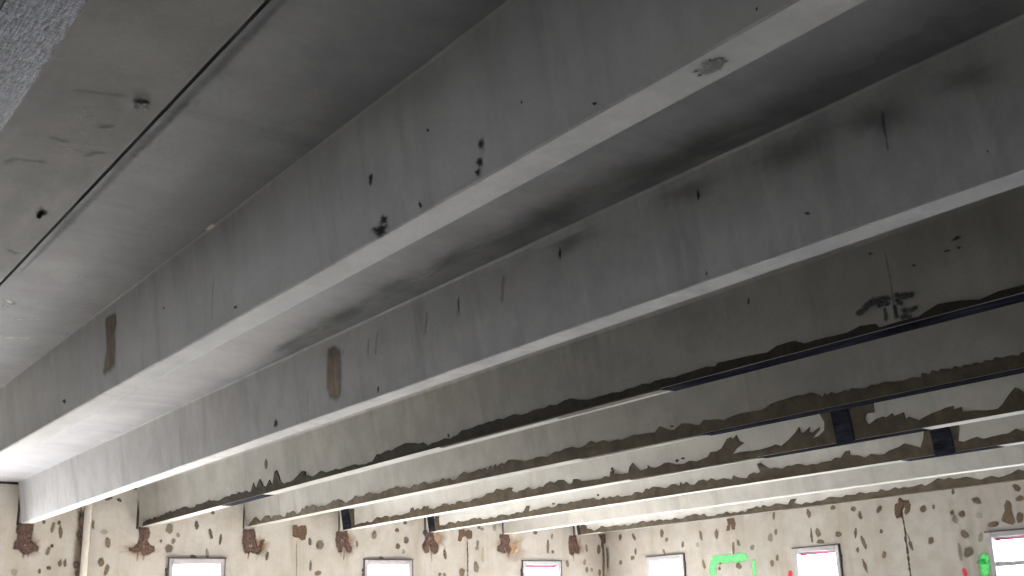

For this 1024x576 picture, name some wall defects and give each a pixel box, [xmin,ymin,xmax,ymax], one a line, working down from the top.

spalling [695,58,727,75]
corrosion [104,315,116,373]
corrosion [327,348,341,398]
spalling [876,498,926,519]
spalling [988,484,1024,527]
corrosion [13,522,39,554]
corrosion [129,527,155,555]
corrosion [242,529,266,554]
corrosion [335,531,353,553]
corrosion [497,534,520,556]